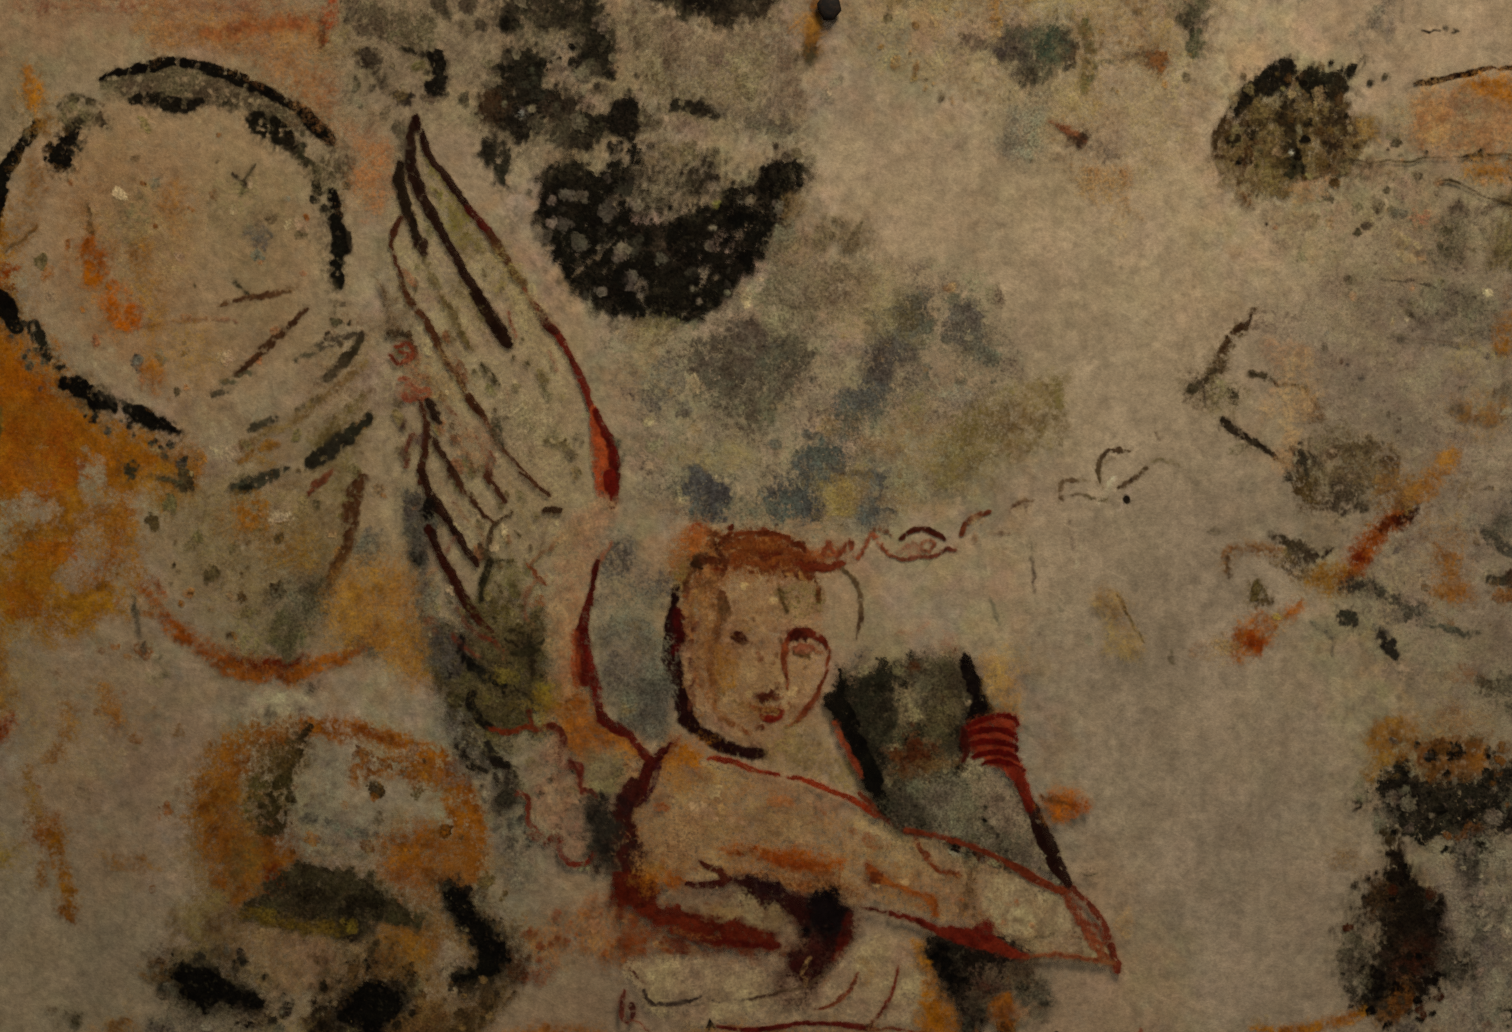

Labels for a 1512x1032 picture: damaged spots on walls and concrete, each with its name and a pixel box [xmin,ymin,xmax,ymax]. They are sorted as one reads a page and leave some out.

water stain [474,0,876,328]
water stain [1212,0,1405,206]
water stain [1409,73,1512,159]
water stain [0,159,202,740]
water stain [1311,577,1480,660]
water stain [1457,665,1512,715]
water stain [91,860,552,1032]
water stain [1250,708,1512,1032]